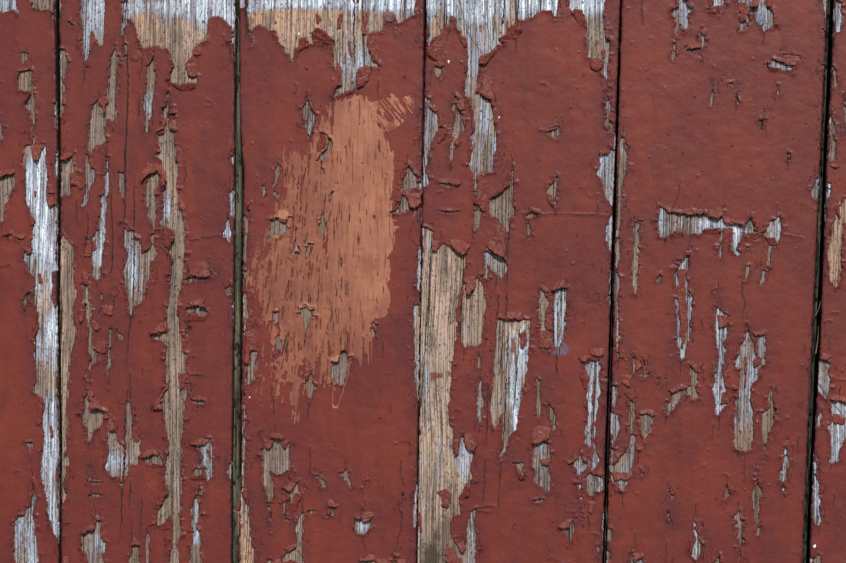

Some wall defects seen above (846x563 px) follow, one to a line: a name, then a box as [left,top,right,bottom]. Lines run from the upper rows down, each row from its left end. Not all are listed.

peeling [828,105,846,168]
peeling [0,0,571,563]
peeling [558,99,660,563]
peeling [689,515,705,563]
peeling [654,198,784,425]
peeling [711,304,778,462]
peeling [731,463,765,563]
peeling [807,178,846,292]
peeling [811,353,846,534]